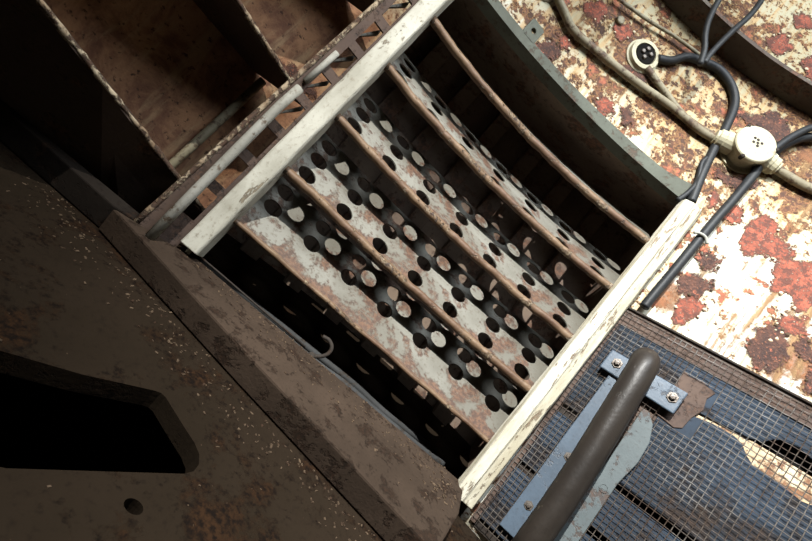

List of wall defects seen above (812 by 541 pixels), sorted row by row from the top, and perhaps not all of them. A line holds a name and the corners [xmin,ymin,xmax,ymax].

corrosion [535,35,564,65]
corrosion [619,106,636,126]
corrosion [736,109,796,143]
corrosion [713,167,763,190]
peeling [704,190,723,211]
corrosion [657,248,723,312]
peeling [723,203,812,342]
peeling [671,295,709,326]
corrosion [705,291,812,395]